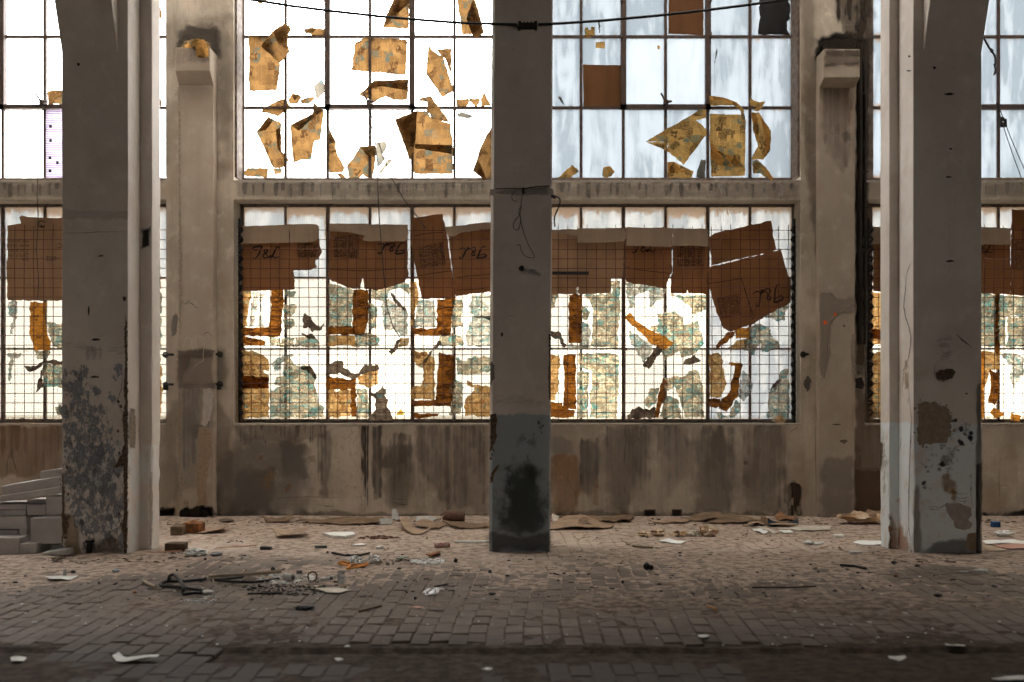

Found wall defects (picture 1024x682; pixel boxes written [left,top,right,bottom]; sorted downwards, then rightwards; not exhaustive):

damp [178,350,214,388]
spalling [935,369,956,382]
peeling [58,314,136,553]
peeling [913,399,955,449]
damp [361,426,369,503]
damp [500,465,546,536]
peeling [945,503,977,551]